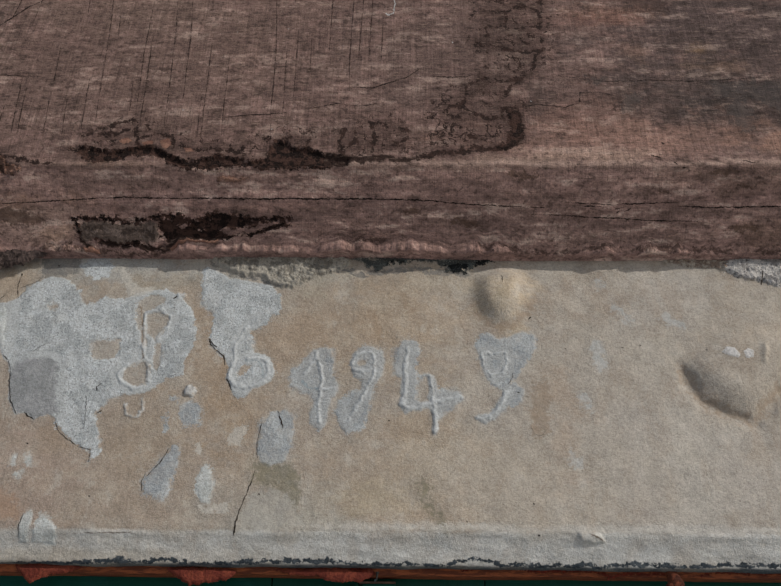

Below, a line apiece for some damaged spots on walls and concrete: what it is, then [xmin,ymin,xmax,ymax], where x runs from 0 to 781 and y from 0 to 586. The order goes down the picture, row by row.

peeling [117,135,196,155]
crack [2,196,781,222]
spalling [660,258,781,290]
peeling [0,274,203,477]
peeling [245,398,313,460]
peeling [2,463,64,559]
crack [233,471,255,535]